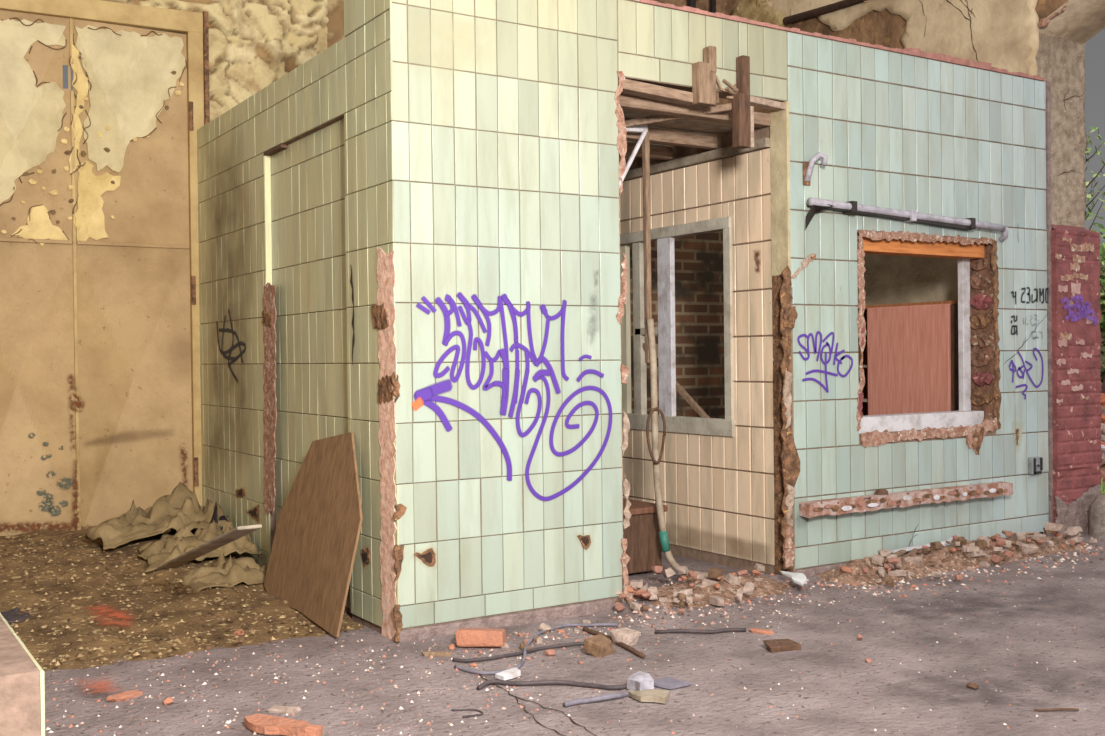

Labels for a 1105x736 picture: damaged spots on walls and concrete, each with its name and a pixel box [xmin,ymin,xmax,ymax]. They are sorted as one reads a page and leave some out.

flaking render [103,0,345,122]
peeling [653,0,812,27]
peeling [817,0,1067,75]
crack [919,0,978,61]
peeling [0,17,187,247]
spalling [614,71,630,196]
spalling [856,229,1002,455]
corrosion [69,375,83,447]
spalling [371,247,407,642]
spalling [780,253,816,569]
spalling [620,473,633,601]
crack [478,674,596,736]